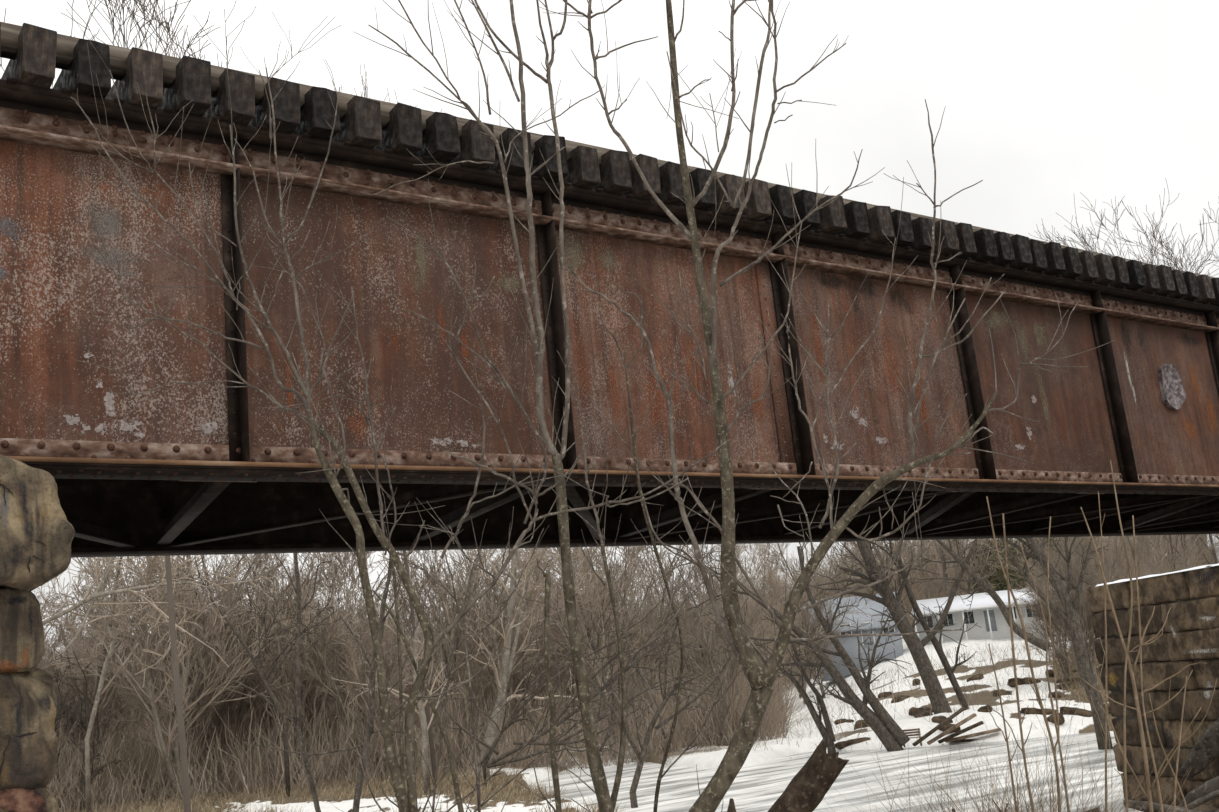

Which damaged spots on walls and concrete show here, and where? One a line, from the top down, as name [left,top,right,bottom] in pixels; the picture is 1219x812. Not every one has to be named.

peeling [63,379,145,438]
peeling [197,421,220,434]